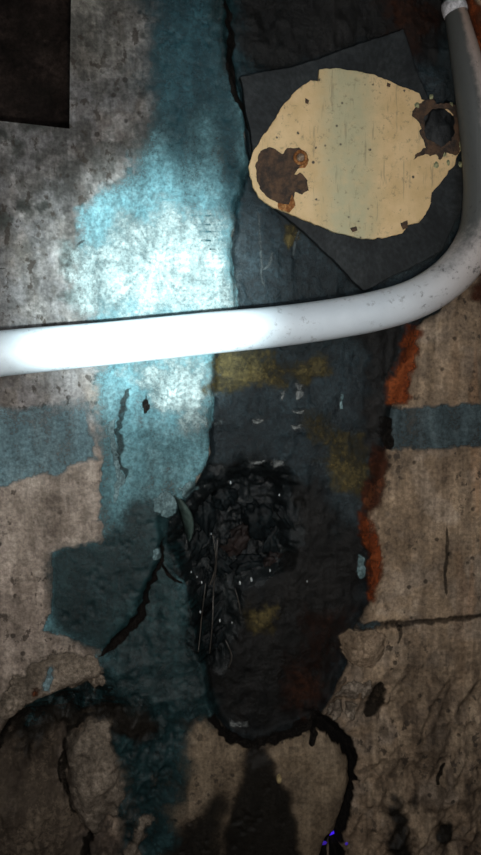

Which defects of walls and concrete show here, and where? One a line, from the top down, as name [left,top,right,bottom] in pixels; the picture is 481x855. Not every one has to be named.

corrosion [386,324,423,404]
crack [99,538,182,680]
crack [355,528,481,644]
damp [22,500,301,855]
crack [0,710,21,748]
crack [57,713,92,812]
crack [80,831,96,855]